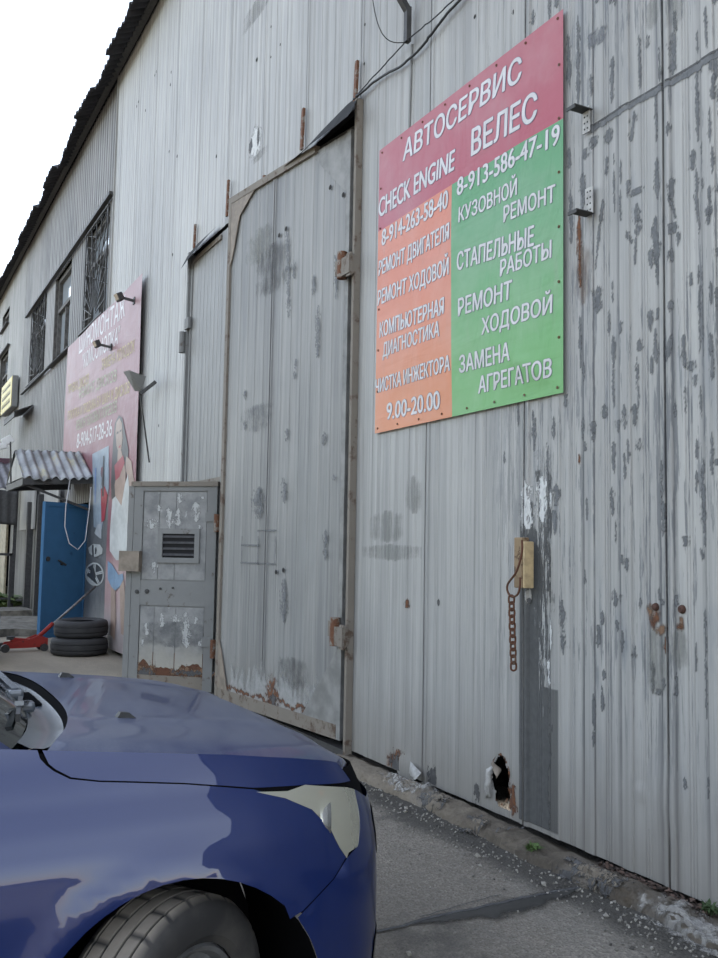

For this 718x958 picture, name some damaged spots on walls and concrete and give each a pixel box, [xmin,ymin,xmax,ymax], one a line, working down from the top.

peeling [581,265,718,479]
peeling [146,493,204,530]
peeling [695,433,718,560]
peeling [140,612,201,648]
peeling [519,411,566,831]
peeling [596,611,636,658]
rust [647,604,684,654]
rust [169,667,215,677]
rust [227,678,306,713]
peeling [651,662,678,696]
peeling [695,610,708,719]